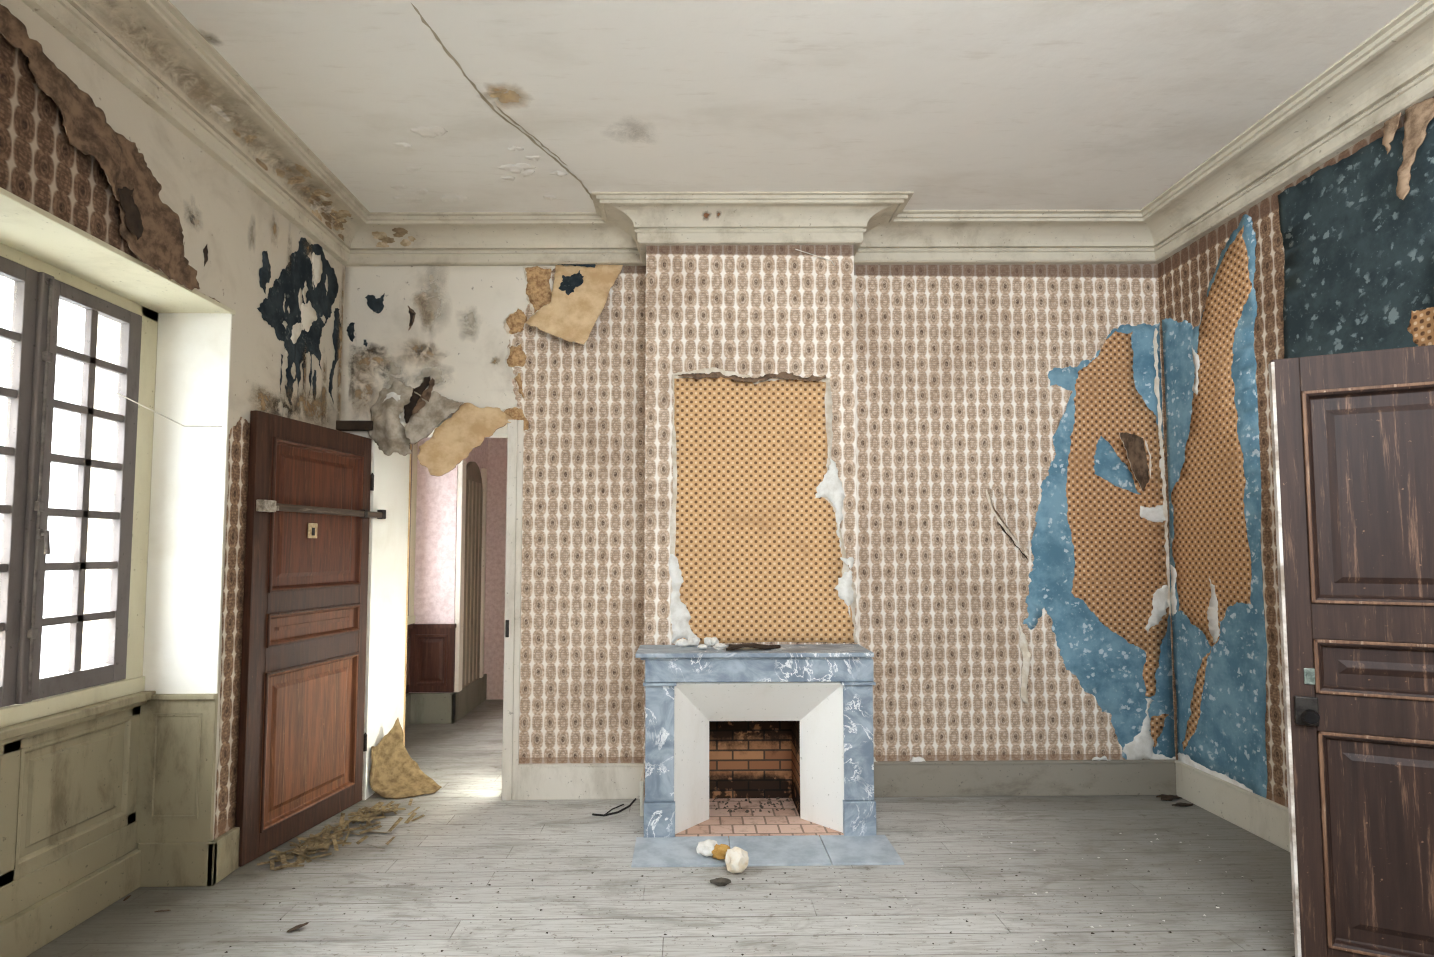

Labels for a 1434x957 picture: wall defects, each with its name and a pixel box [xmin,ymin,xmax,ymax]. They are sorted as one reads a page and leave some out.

crack [411,3,593,200]
peeling [210,104,352,241]
peeling [372,228,416,247]
mould [257,291,442,419]
flaking render [257,237,529,439]
flaking render [1192,348,1200,395]
peeling [815,456,854,615]
flaking render [1140,505,1165,522]
peeling [669,554,695,643]
flaking render [1145,564,1177,632]
flaking render [1207,578,1220,643]
flaking render [1092,698,1253,793]